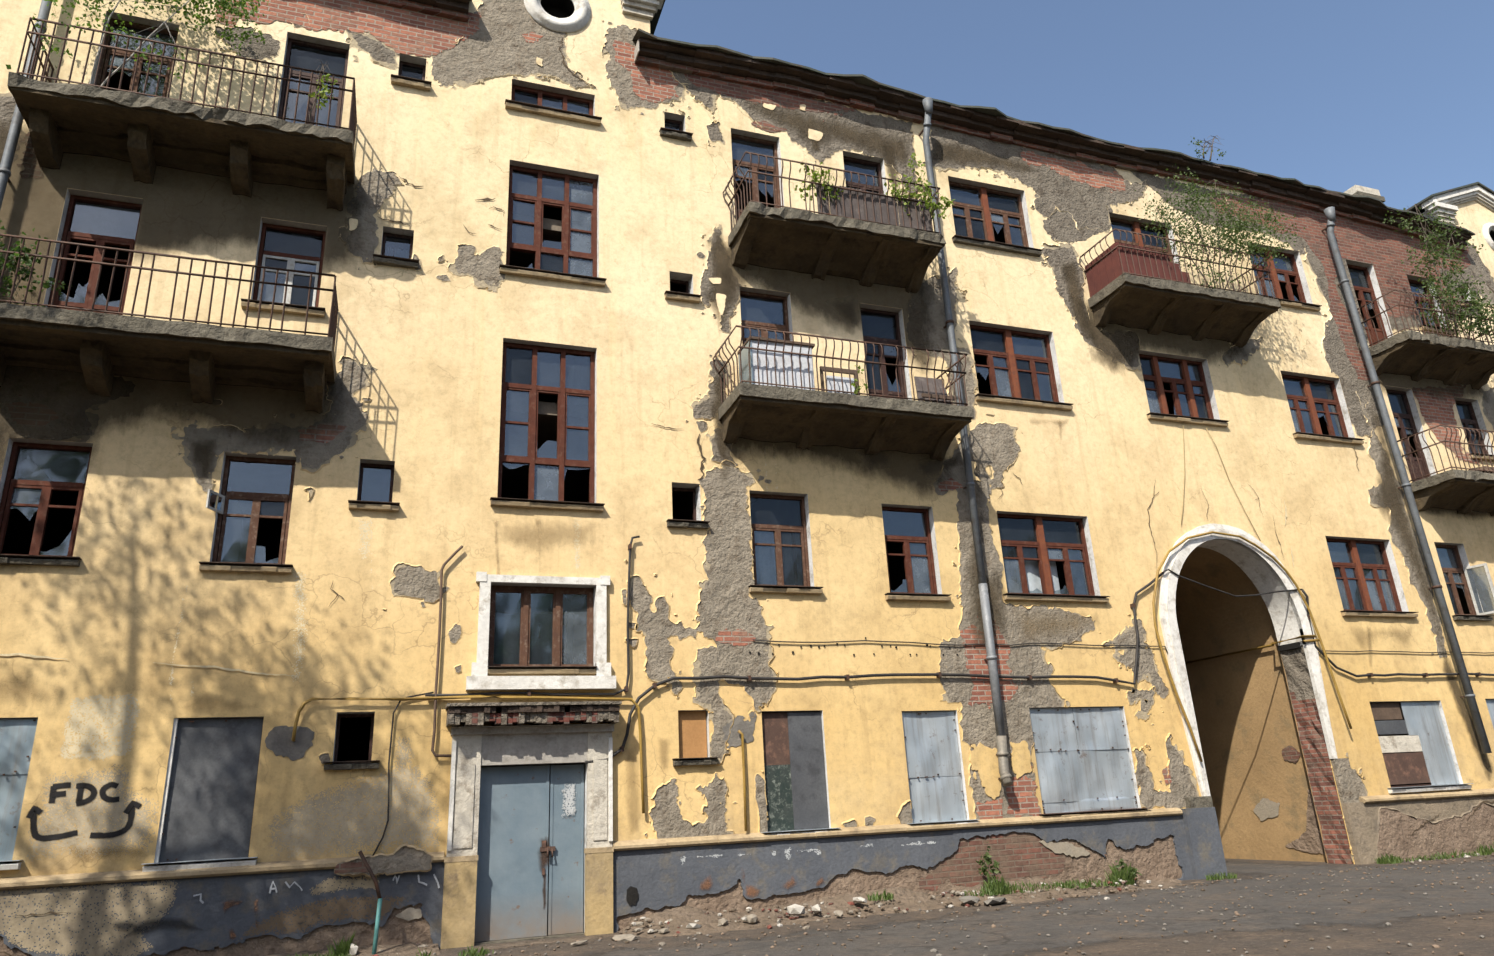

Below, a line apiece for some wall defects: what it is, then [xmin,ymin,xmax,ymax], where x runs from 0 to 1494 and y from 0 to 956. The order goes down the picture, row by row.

peeling [169,355,378,501]
peeling [265,725,332,766]
peeling [395,908,422,921]
peeling [621,352,779,847]
flaking render [213,0,1494,659]
peeling [908,266,1200,819]